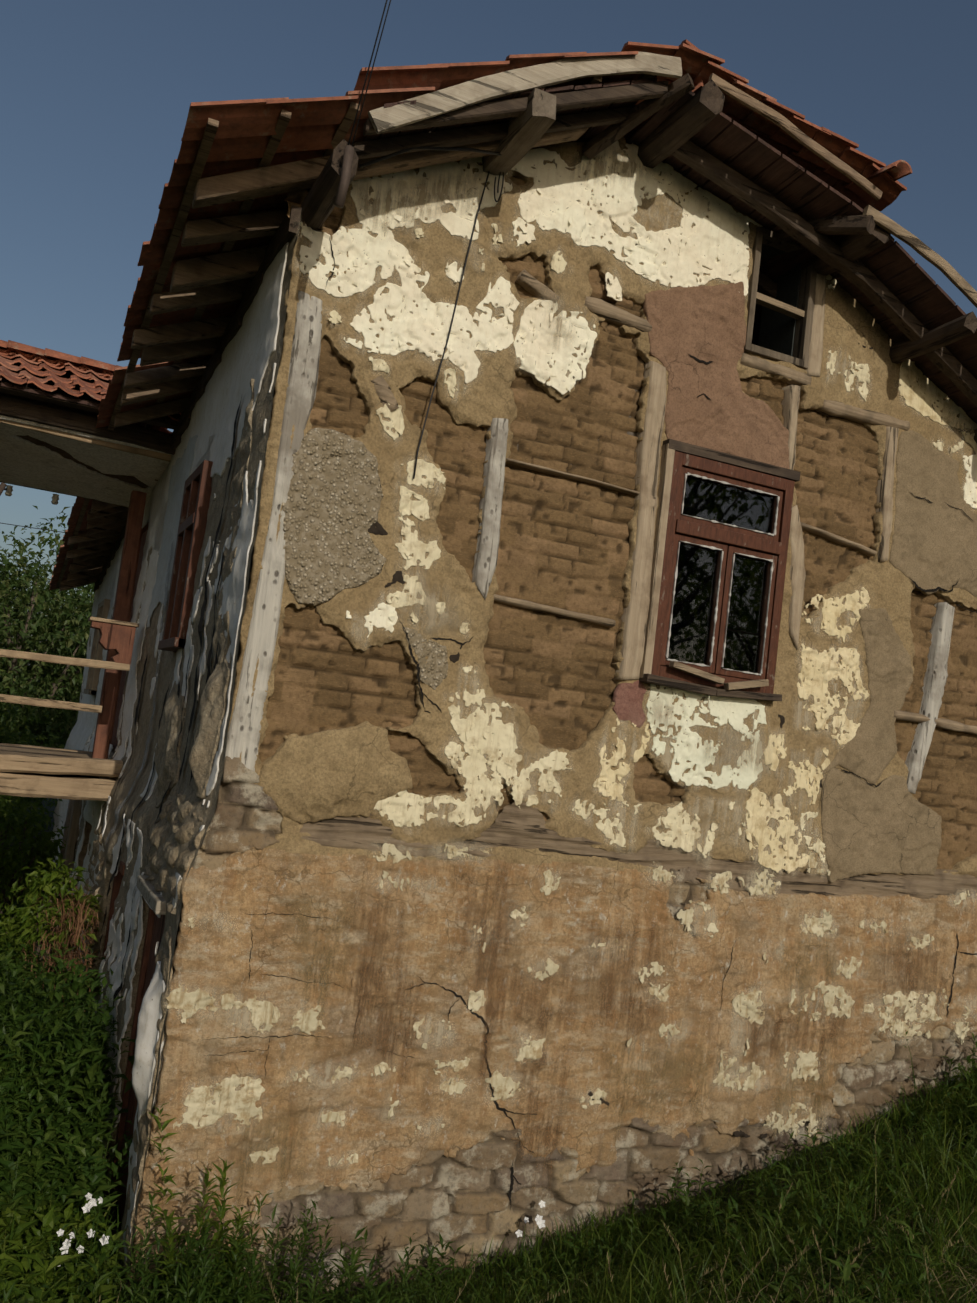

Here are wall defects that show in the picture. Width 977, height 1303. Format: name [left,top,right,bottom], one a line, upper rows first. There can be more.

peeling [898,360,977,509]
peeling [18,140,879,1297]
flaking render [894,589,977,870]
peeling [907,934,934,950]
peeling [951,890,977,907]
crack [406,977,537,1210]